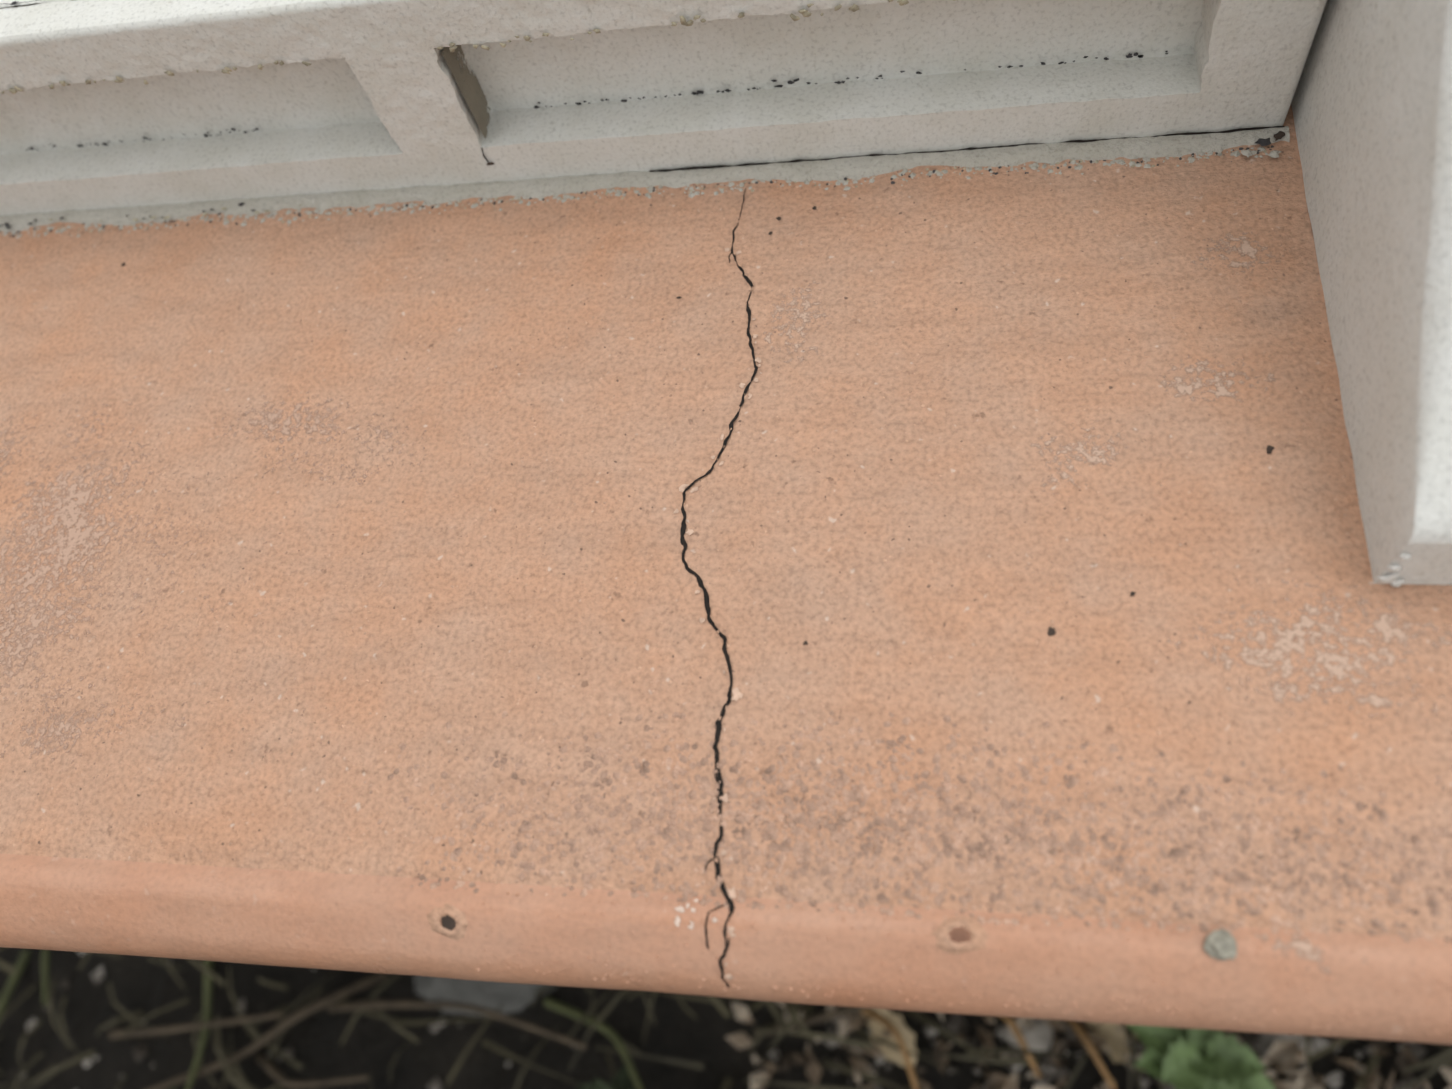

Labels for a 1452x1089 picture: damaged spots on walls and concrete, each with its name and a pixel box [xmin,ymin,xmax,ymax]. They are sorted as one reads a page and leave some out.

crack [673,188,762,988]